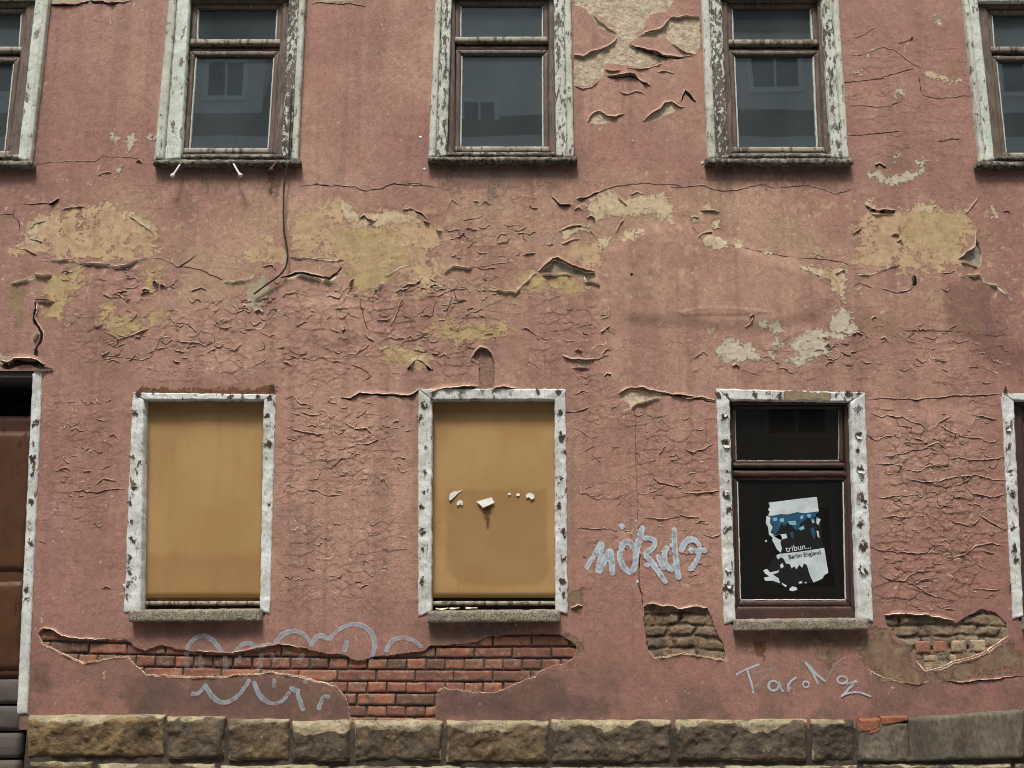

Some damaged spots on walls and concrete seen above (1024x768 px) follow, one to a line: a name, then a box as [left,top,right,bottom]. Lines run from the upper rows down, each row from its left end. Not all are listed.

spalling [573,0,701,94]
crack [301,182,434,191]
crack [0,254,539,381]
peeling [6,180,680,504]
peeling [689,194,1011,385]
peeling [122,519,136,600]
crack [286,394,410,496]
crack [578,404,721,538]
spalling [607,475,728,663]
crack [865,393,1007,610]
spalling [855,399,1024,688]
spalling [38,625,585,721]